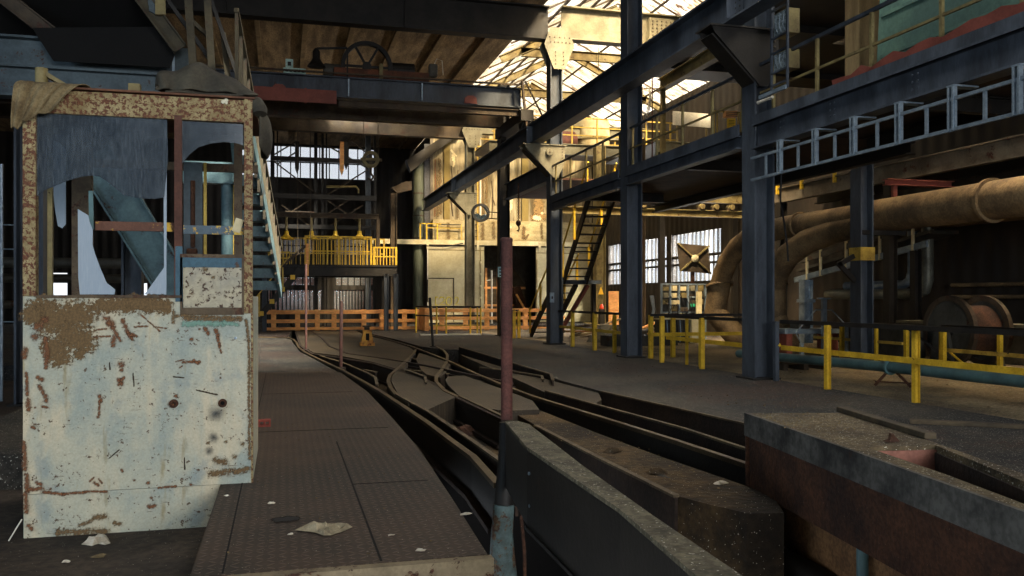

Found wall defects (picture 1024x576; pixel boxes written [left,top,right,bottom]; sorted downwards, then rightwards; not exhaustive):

corrosion [22,316,50,412]
corrosion [93,310,251,477]
corrosion [22,441,108,531]
corrosion [55,513,122,536]
corrosion [120,469,192,509]